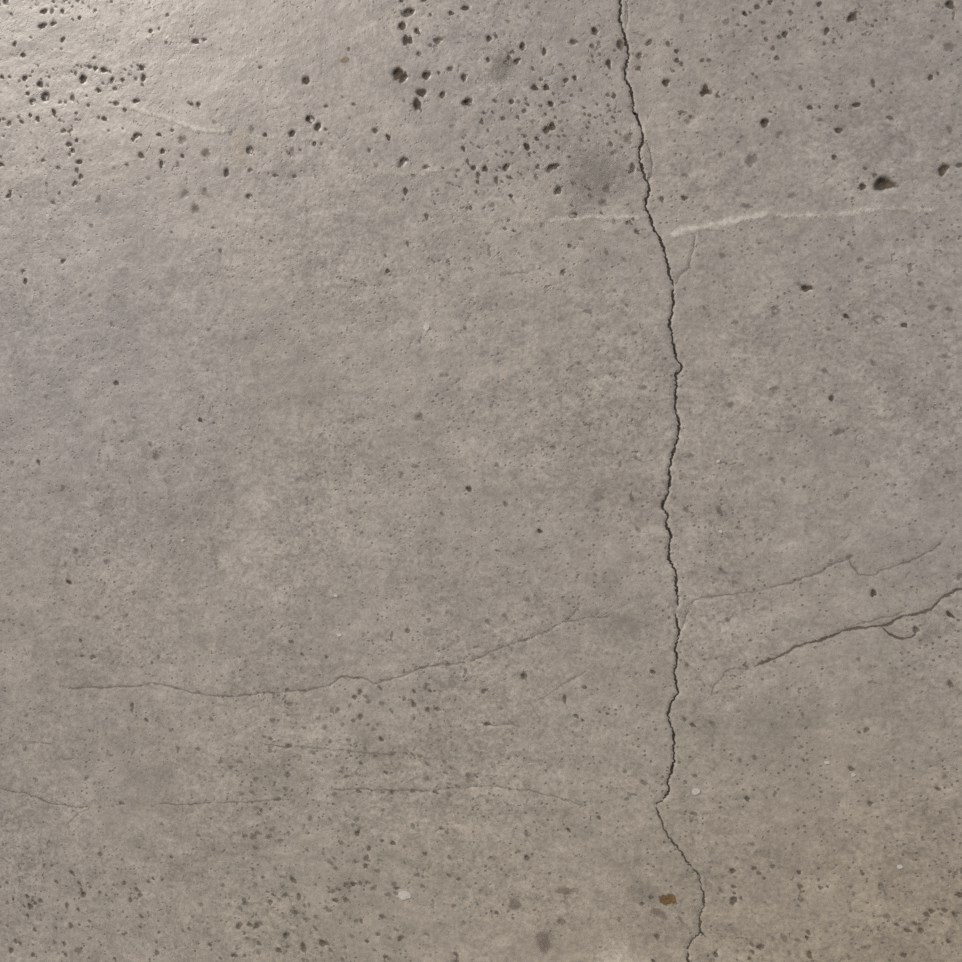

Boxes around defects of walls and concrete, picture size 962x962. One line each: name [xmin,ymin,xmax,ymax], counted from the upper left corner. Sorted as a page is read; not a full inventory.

crack [618,0,705,962]
crack [757,588,962,665]